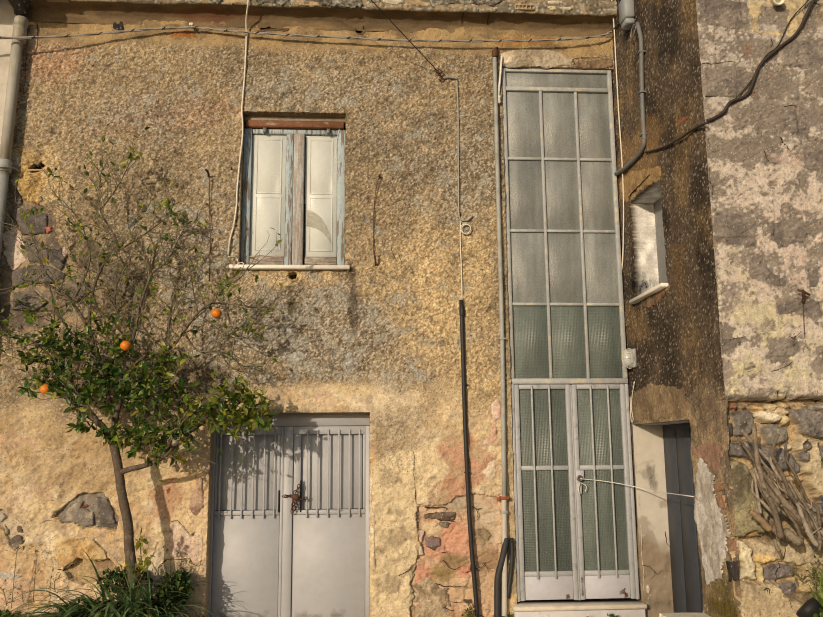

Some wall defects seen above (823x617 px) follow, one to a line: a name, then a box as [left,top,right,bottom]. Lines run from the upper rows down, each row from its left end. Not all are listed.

flaking render [0,153,110,332]
peeling [483,399,501,445]
peeling [482,460,496,480]
flaking render [0,509,26,550]
flaking render [55,492,119,529]
peeling [691,442,739,585]
flaking render [407,493,502,617]